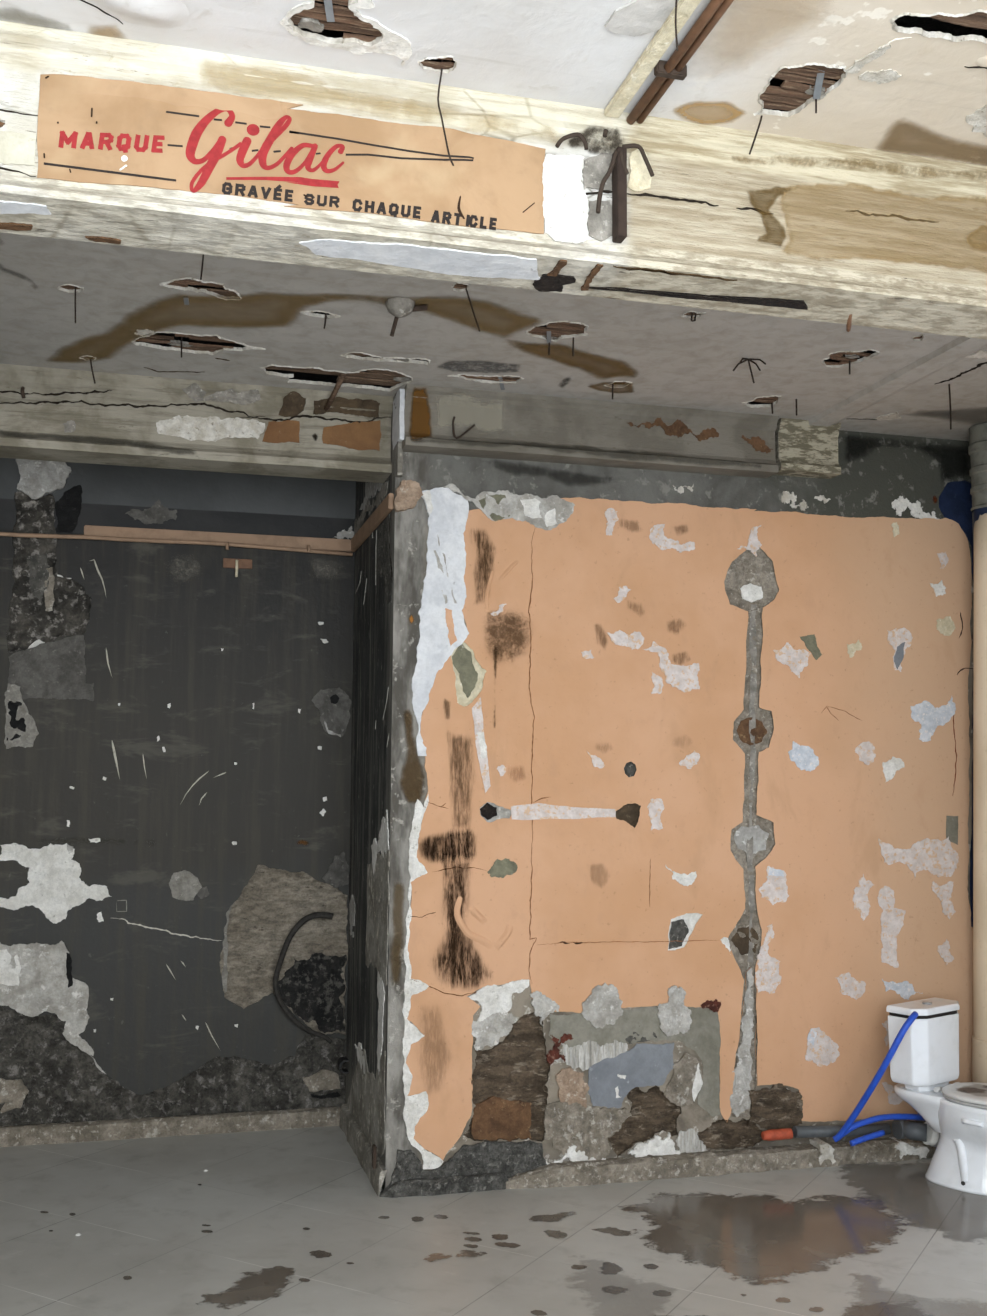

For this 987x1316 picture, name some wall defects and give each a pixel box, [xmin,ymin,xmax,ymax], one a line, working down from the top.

crack [80,0,123,24]
crack [0,108,38,116]
crack [0,167,36,177]
leakage [51,294,388,362]
leakage [413,298,636,393]
leakage [453,739,468,797]
leakage [422,814,484,987]
peeling [487,858,518,878]
flaking render [668,913,702,951]
flaking render [0,810,390,1156]
flaking render [402,796,444,1169]
flaking render [463,924,803,1165]